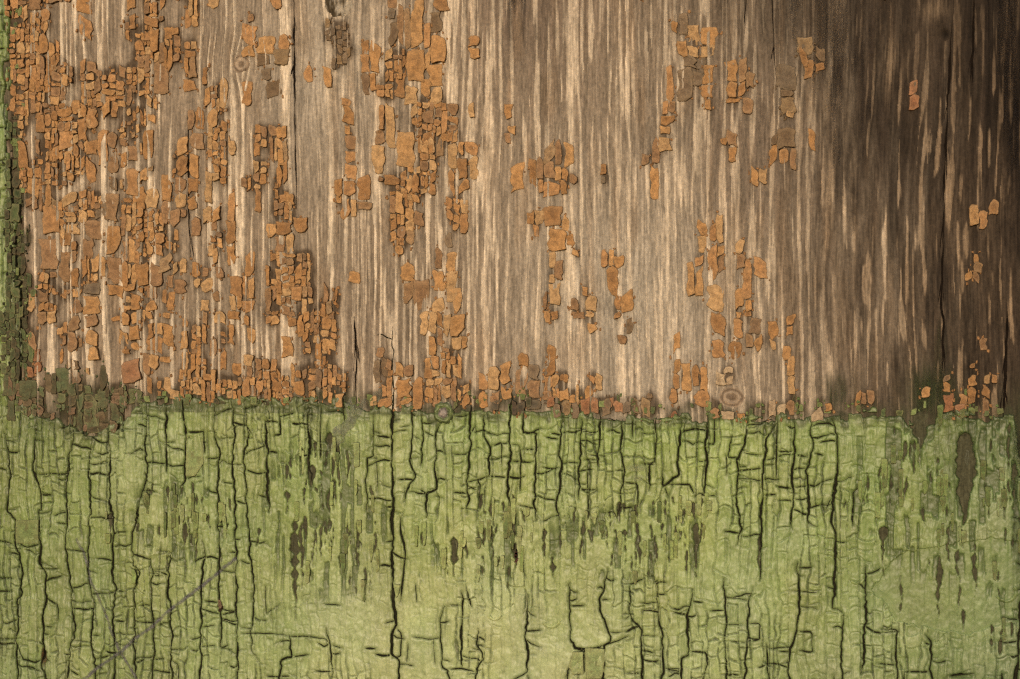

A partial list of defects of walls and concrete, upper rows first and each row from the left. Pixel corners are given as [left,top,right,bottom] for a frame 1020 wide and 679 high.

crack [186,118,194,261]
crack [289,0,297,209]
peeling [0,0,875,436]
crack [938,0,975,369]
peeling [969,199,999,230]
crack [1000,312,1008,417]
peeling [285,433,380,602]
crack [0,320,972,679]
peeling [441,495,556,582]
peeling [573,493,713,585]
peeling [858,335,1020,654]
crack [1000,589,1020,679]